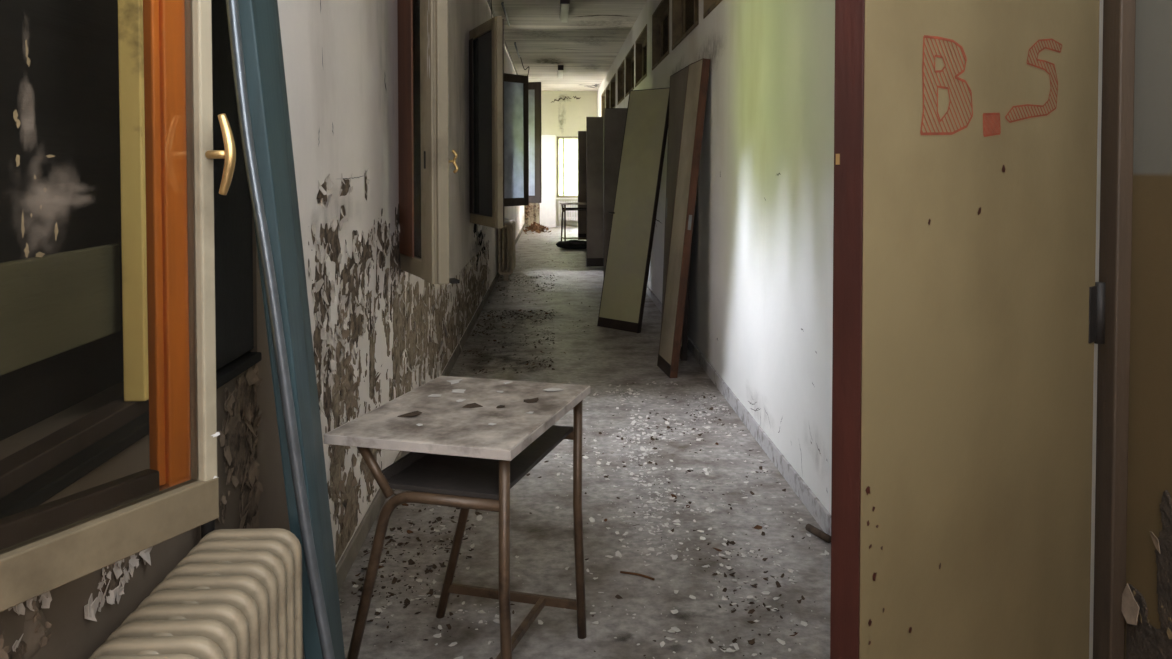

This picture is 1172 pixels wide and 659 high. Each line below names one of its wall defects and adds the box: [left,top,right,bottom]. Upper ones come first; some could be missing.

peeling [308,170,491,565]
peeling [8,591,52,615]
peeling [84,546,153,622]
peeling [7,634,27,659]